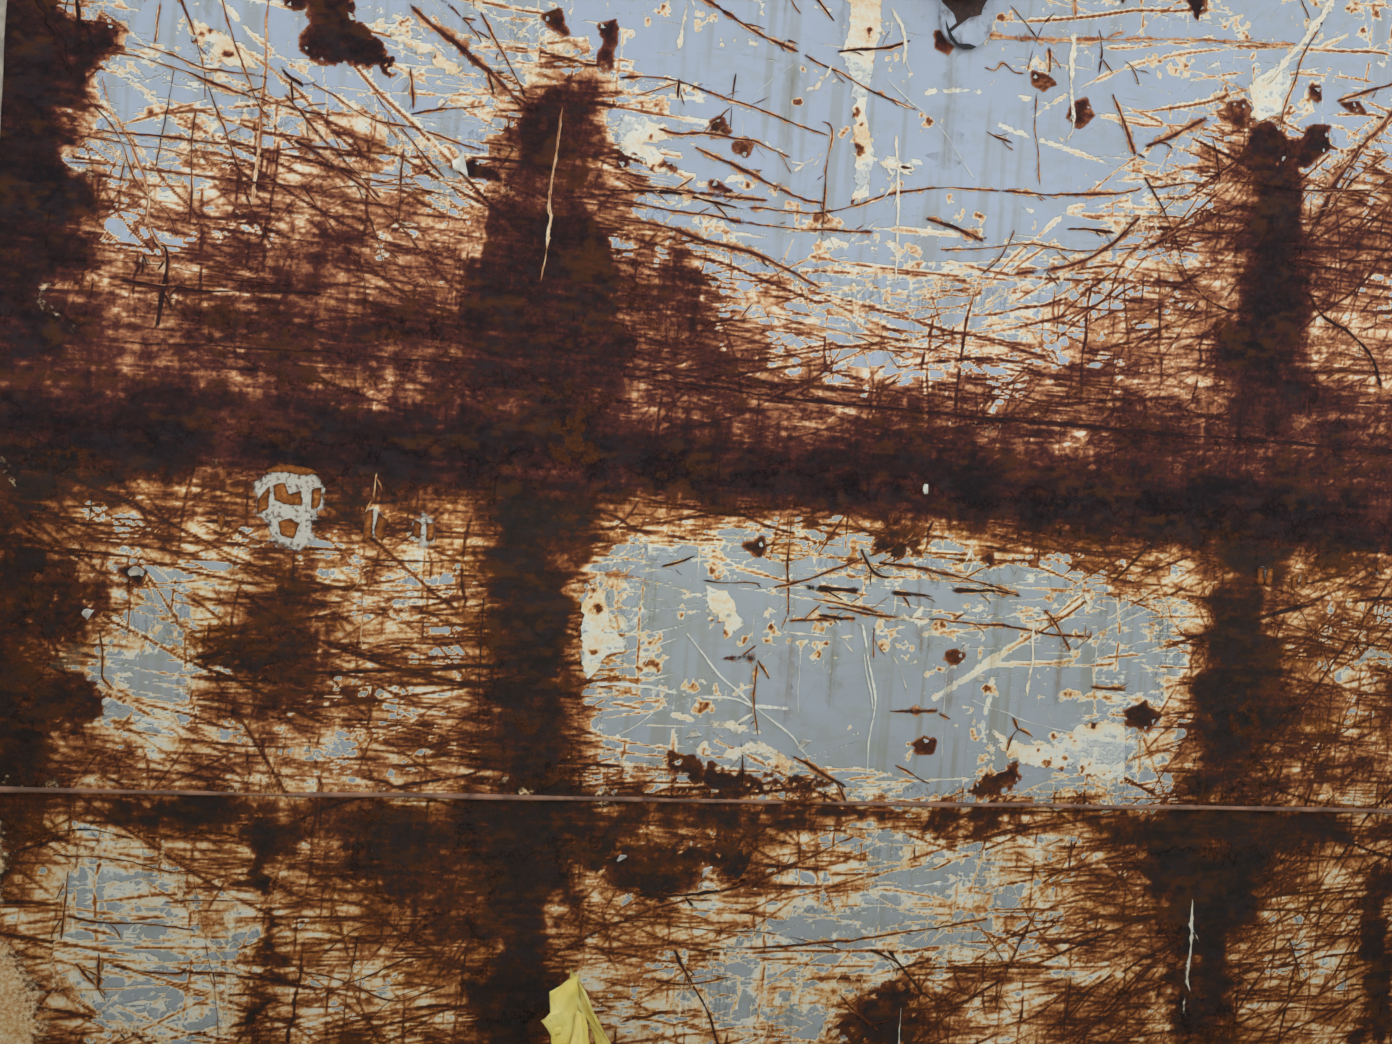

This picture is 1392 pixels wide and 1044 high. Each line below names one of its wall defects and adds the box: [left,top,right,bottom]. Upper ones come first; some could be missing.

rust [942,0,987,32]
peeling [282,0,397,103]
peeling [596,19,619,74]
peeling [1225,82,1332,183]
rust [273,483,303,506]
rust [278,518,299,539]
rust [1265,567,1274,586]
peeling [1122,700,1162,734]
peeling [656,728,834,804]
peeling [967,760,1022,803]
rust [1219,795,1246,806]
rust [807,972,904,1044]